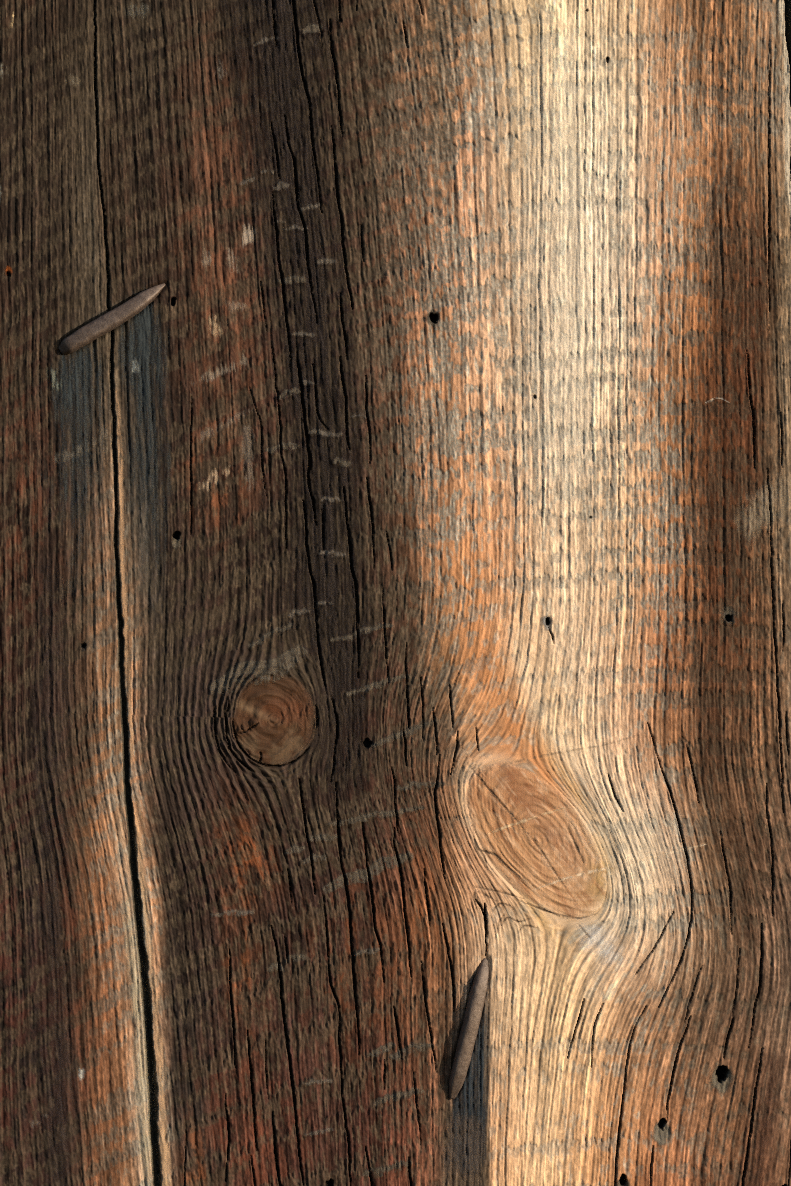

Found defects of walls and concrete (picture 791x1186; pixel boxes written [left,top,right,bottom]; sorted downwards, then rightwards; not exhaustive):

crack [768,0,791,294]
crack [94,0,186,1186]
crack [187,417,195,519]
crack [214,0,559,1186]
crack [747,360,782,466]
crack [766,496,788,900]
crack [474,839,588,952]
crack [614,1034,632,1186]
crack [644,730,699,1111]
crack [721,842,762,1186]